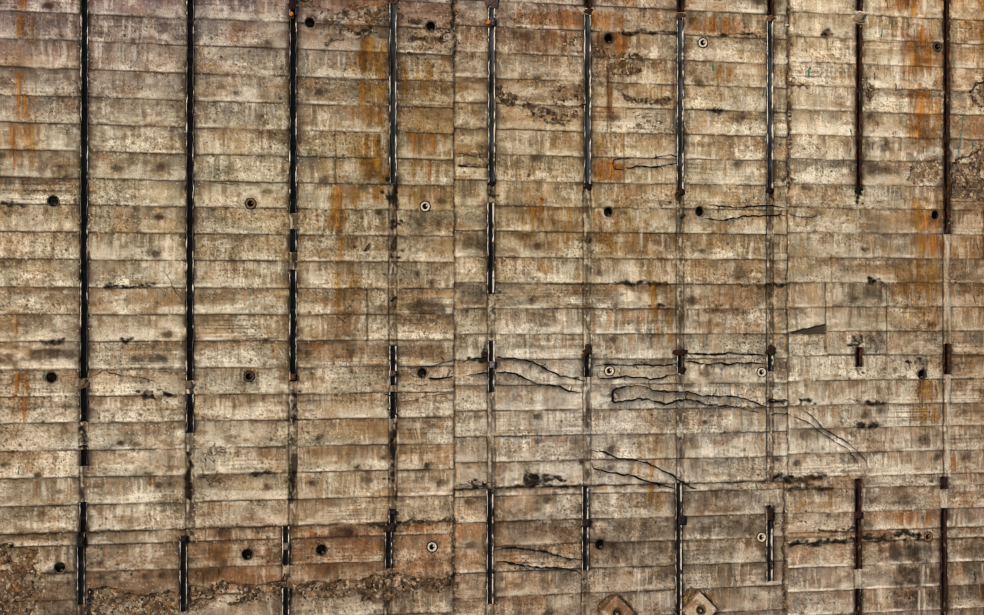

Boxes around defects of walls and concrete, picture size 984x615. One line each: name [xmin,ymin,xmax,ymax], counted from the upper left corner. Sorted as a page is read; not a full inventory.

rust [349,0,390,199]
rust [898,0,941,144]
spalling [966,74,984,115]
spalling [906,146,984,205]
rust [331,186,360,261]
crack [400,349,868,468]
crack [590,449,696,489]
spalling [0,543,47,615]
spalling [85,562,463,615]
crack [495,546,582,574]